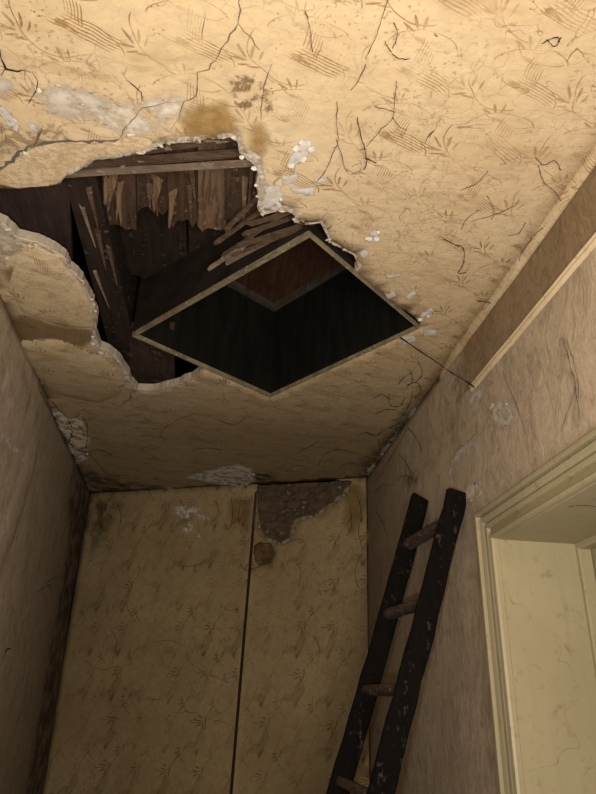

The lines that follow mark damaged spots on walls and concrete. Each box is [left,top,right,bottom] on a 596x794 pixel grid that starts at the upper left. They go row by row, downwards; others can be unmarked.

crack [0,0,258,170]
damp [185,106,233,137]
damp [253,127,265,152]
peeling [0,84,381,271]
peeling [386,290,416,300]
peeling [401,307,437,345]
crack [561,338,579,431]
peeling [53,409,90,462]
spalling [187,464,352,566]